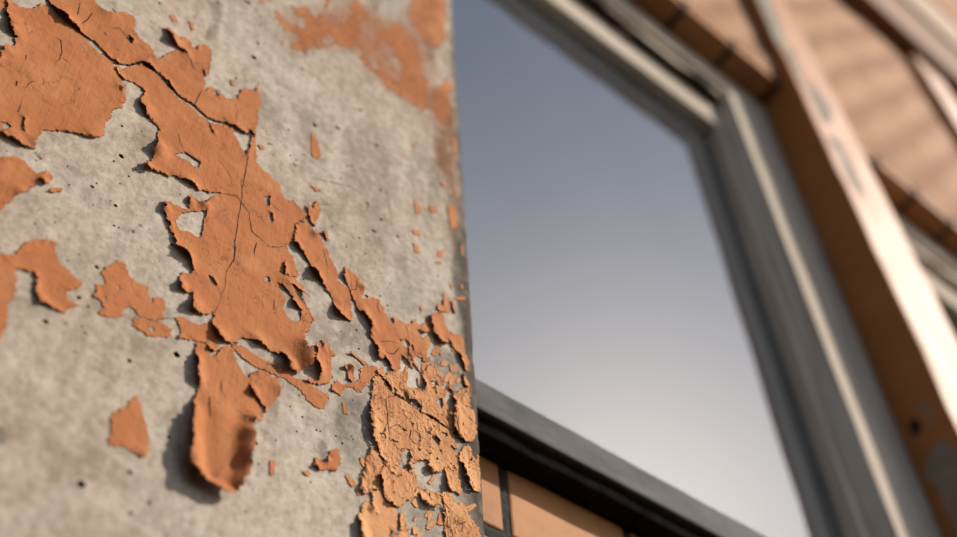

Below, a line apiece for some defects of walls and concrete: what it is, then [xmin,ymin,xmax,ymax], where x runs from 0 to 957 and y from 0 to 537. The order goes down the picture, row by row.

crack [16,38,67,112]
crack [77,3,286,315]
peeling [0,0,470,493]